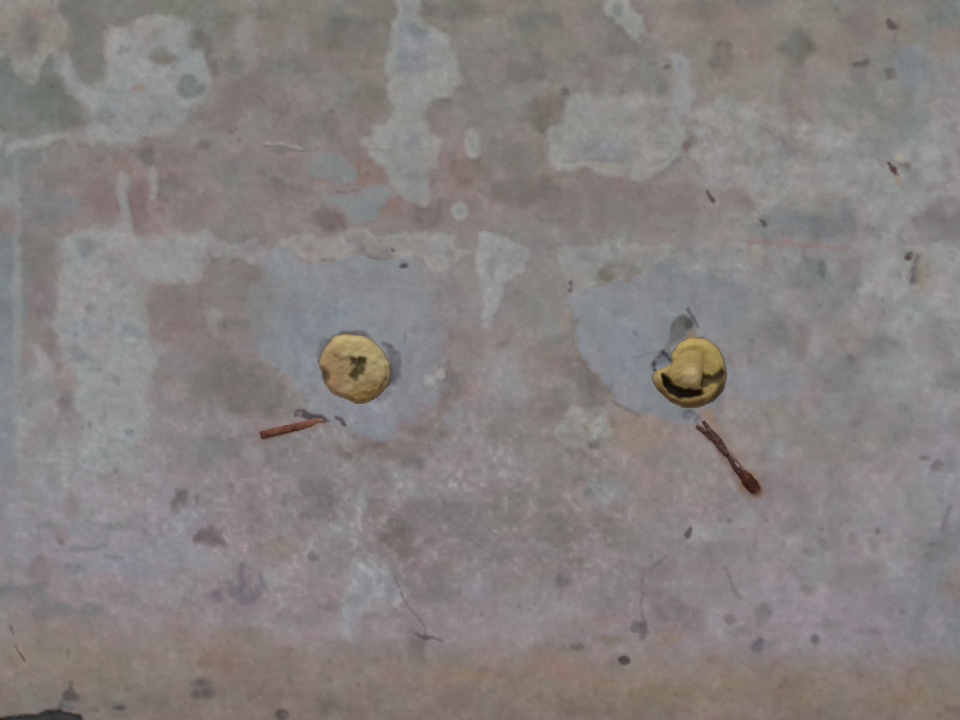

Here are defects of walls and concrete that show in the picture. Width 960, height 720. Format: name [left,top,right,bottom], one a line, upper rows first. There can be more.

corrosion [254,414,330,444]
corrosion [692,406,768,502]